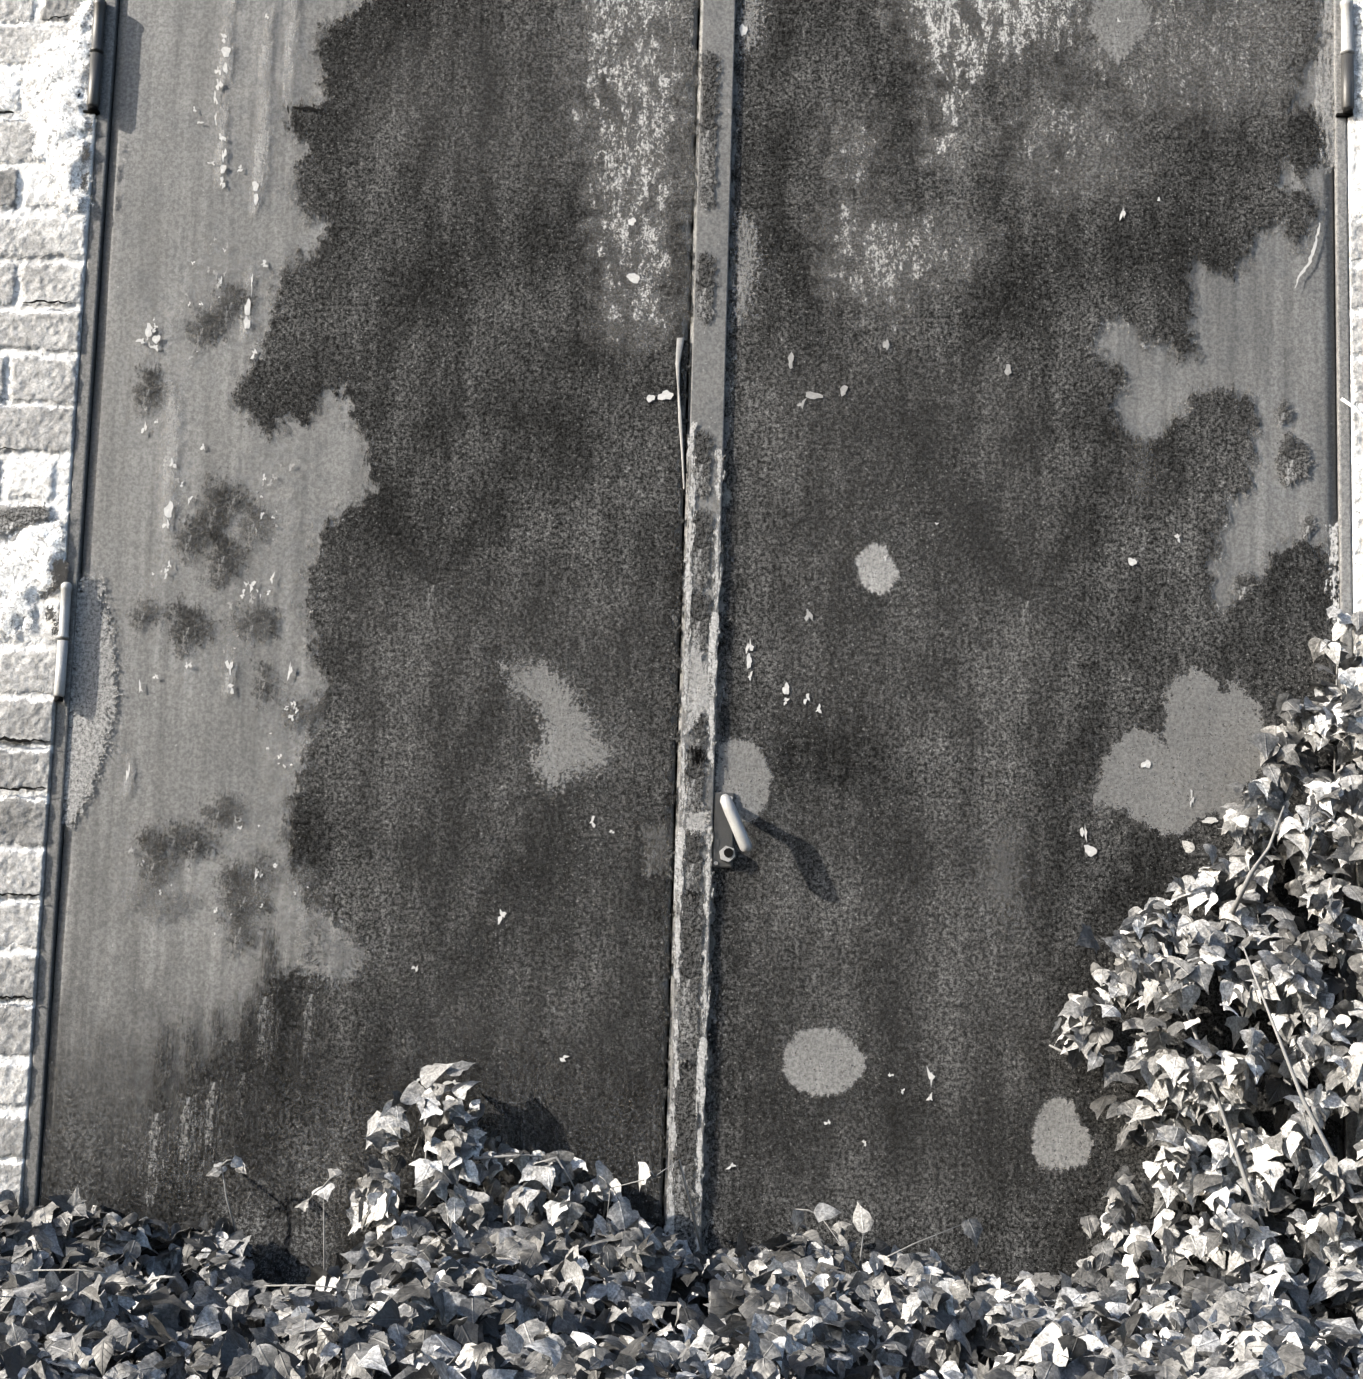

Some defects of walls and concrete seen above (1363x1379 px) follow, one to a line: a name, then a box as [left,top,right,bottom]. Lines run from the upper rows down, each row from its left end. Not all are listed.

rust [318,1218,365,1270]
rust [126,0,701,1232]
rust [702,0,1345,1287]
rust [1307,1275,1335,1318]